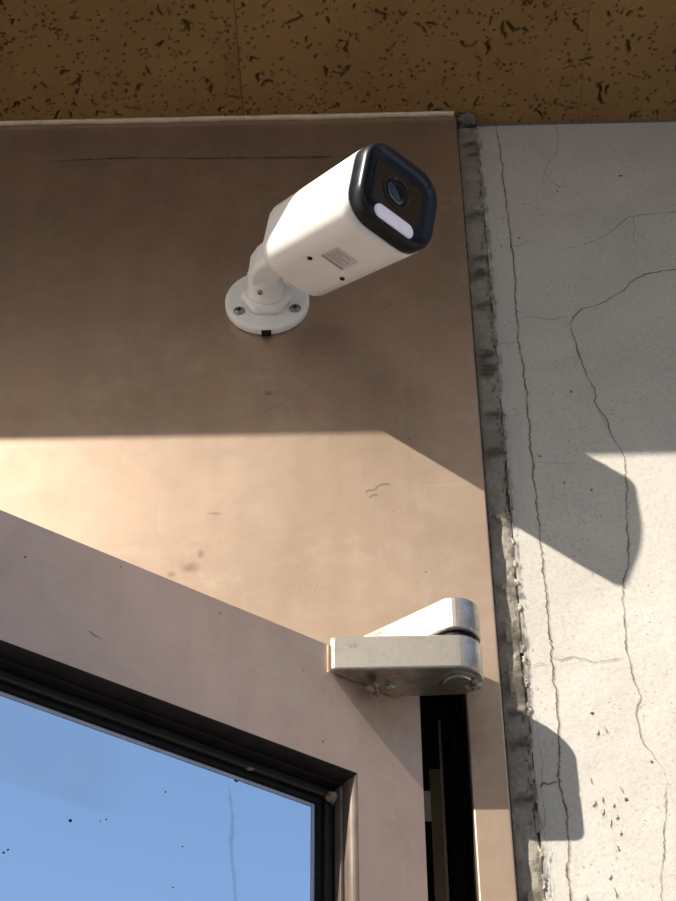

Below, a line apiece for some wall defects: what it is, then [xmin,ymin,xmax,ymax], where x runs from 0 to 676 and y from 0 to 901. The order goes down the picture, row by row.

crack [495,126,676,901]